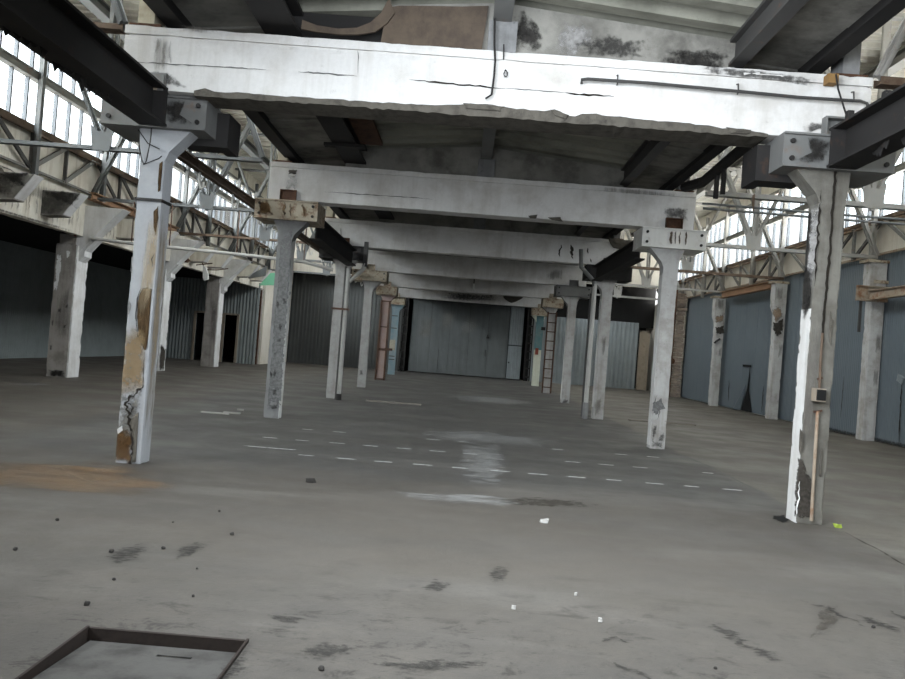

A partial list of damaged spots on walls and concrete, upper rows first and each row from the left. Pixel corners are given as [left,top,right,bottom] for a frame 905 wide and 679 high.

leakage [560,27,590,54]
crack [139,62,265,70]
crack [302,54,359,76]
crack [409,79,615,114]
rust [260,201,305,216]
spalling [127,288,151,350]